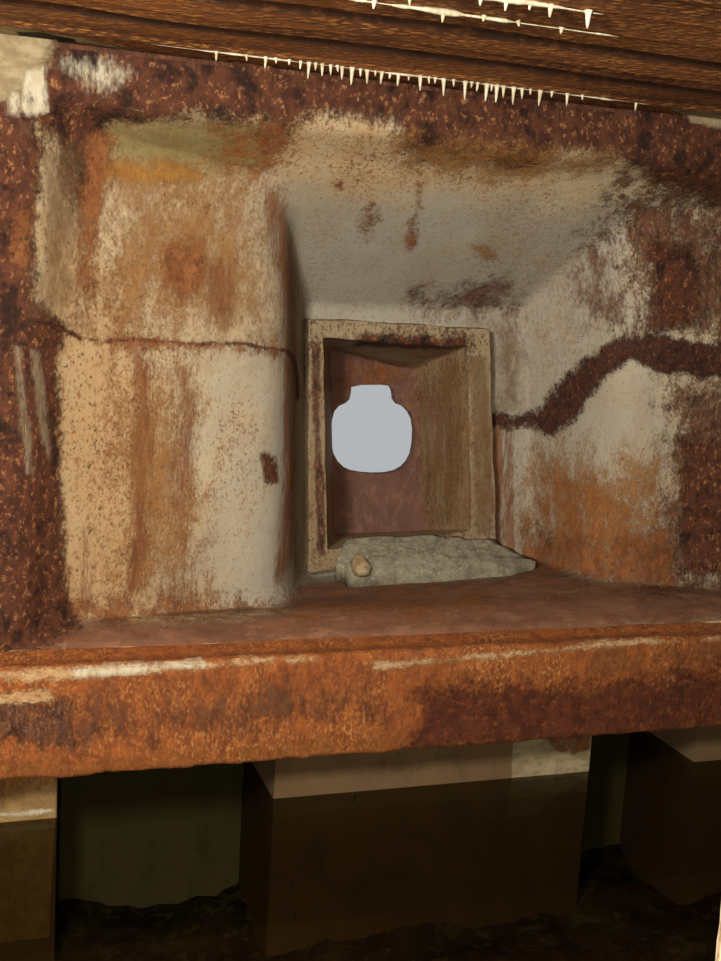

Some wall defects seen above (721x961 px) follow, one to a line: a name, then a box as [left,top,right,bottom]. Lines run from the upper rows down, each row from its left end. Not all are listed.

crack [28,318,299,401]
corrosion [0,45,721,652]
corrosion [0,674,374,795]
corrosion [357,640,721,751]